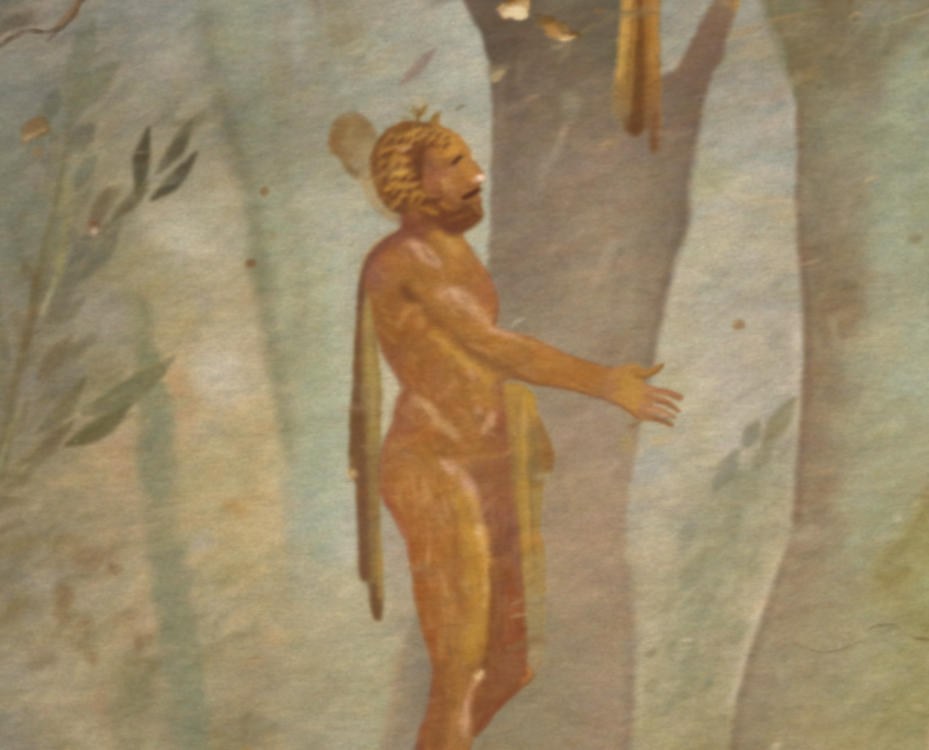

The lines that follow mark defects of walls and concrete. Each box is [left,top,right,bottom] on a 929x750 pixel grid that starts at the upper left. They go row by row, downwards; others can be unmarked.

crack [0,0,85,46]
spalling [498,0,580,49]
spalling [20,116,50,158]